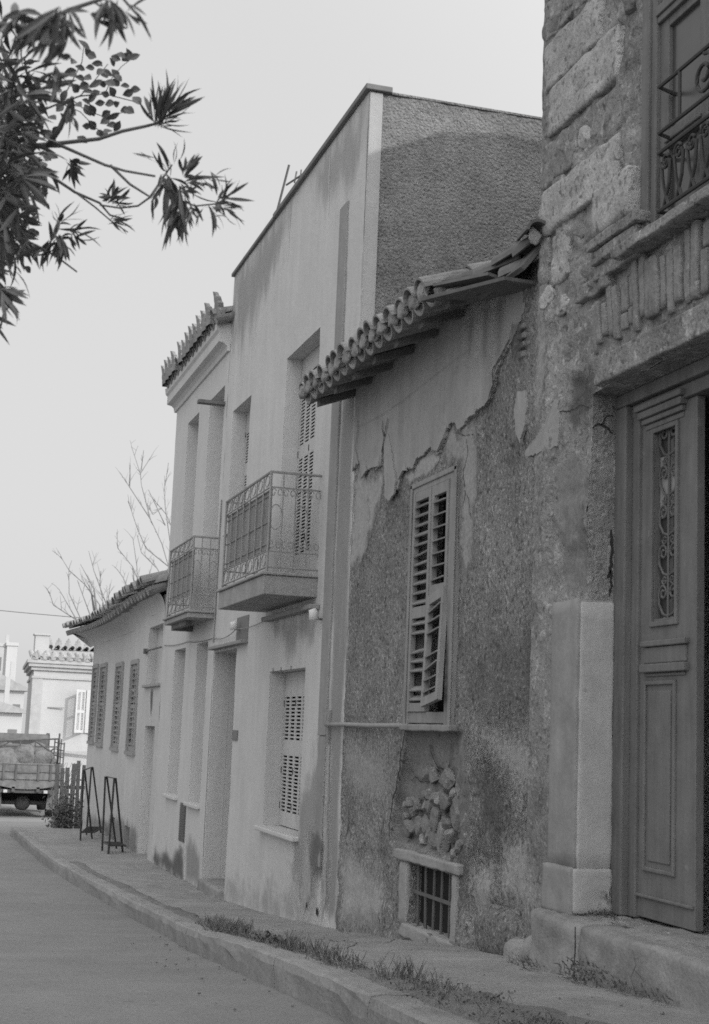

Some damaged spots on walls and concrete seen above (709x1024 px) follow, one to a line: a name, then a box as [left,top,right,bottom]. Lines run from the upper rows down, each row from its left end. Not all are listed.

peeling [514,390,562,458]
peeling [350,403,478,593]
crack [606,530,614,597]
spalling [388,731,470,859]
leakage [153,850,182,879]